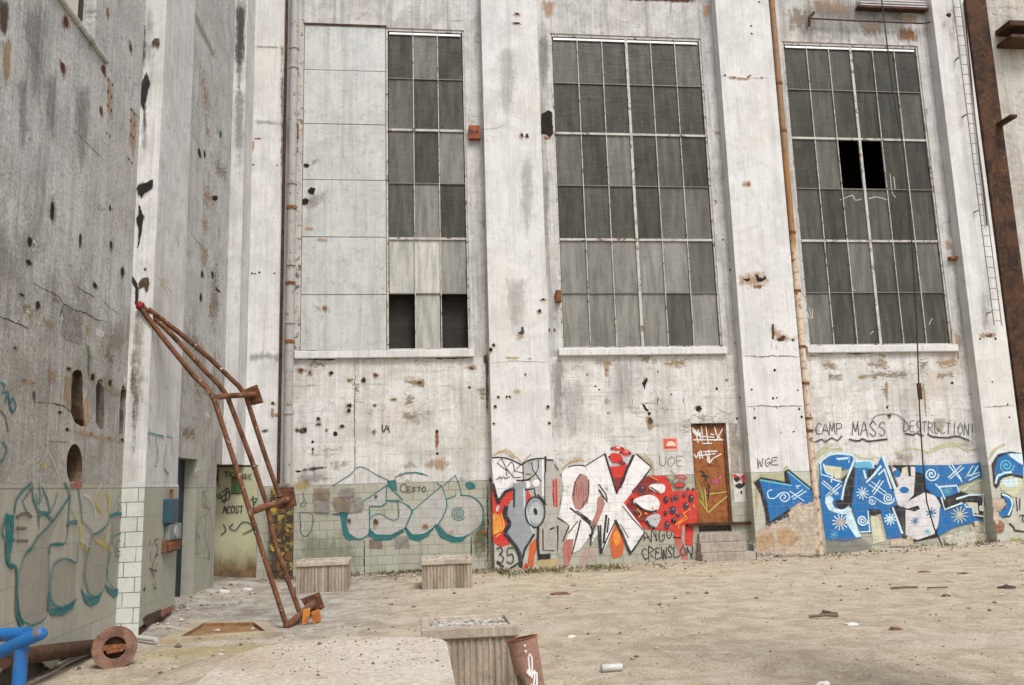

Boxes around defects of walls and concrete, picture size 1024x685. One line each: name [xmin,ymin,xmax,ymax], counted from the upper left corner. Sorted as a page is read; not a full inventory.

crack [33,276,118,322]
rust [772,324,795,349]
peeling [809,354,843,381]
peeling [859,353,958,396]
peeling [750,500,822,558]